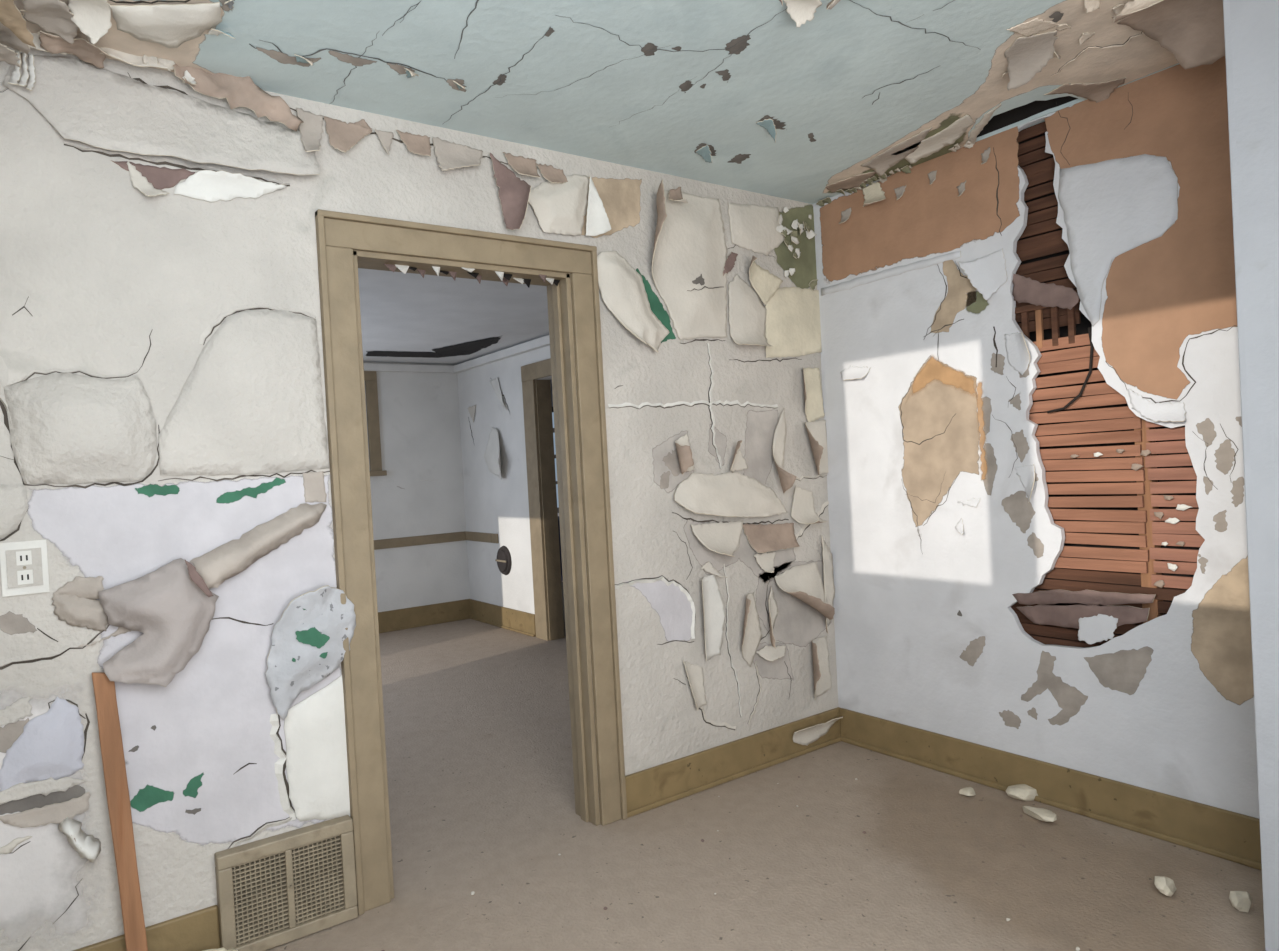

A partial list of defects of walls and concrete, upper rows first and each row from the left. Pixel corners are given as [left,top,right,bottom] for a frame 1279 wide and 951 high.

peeling [0,0,642,238]
crack [250,0,787,127]
peeling [384,264,560,288]
peeling [597,0,1244,729]
peeling [468,405,501,479]
crack [0,611,131,670]
peeling [0,302,356,845]
spalling [1191,556,1254,705]
peeling [793,716,843,746]